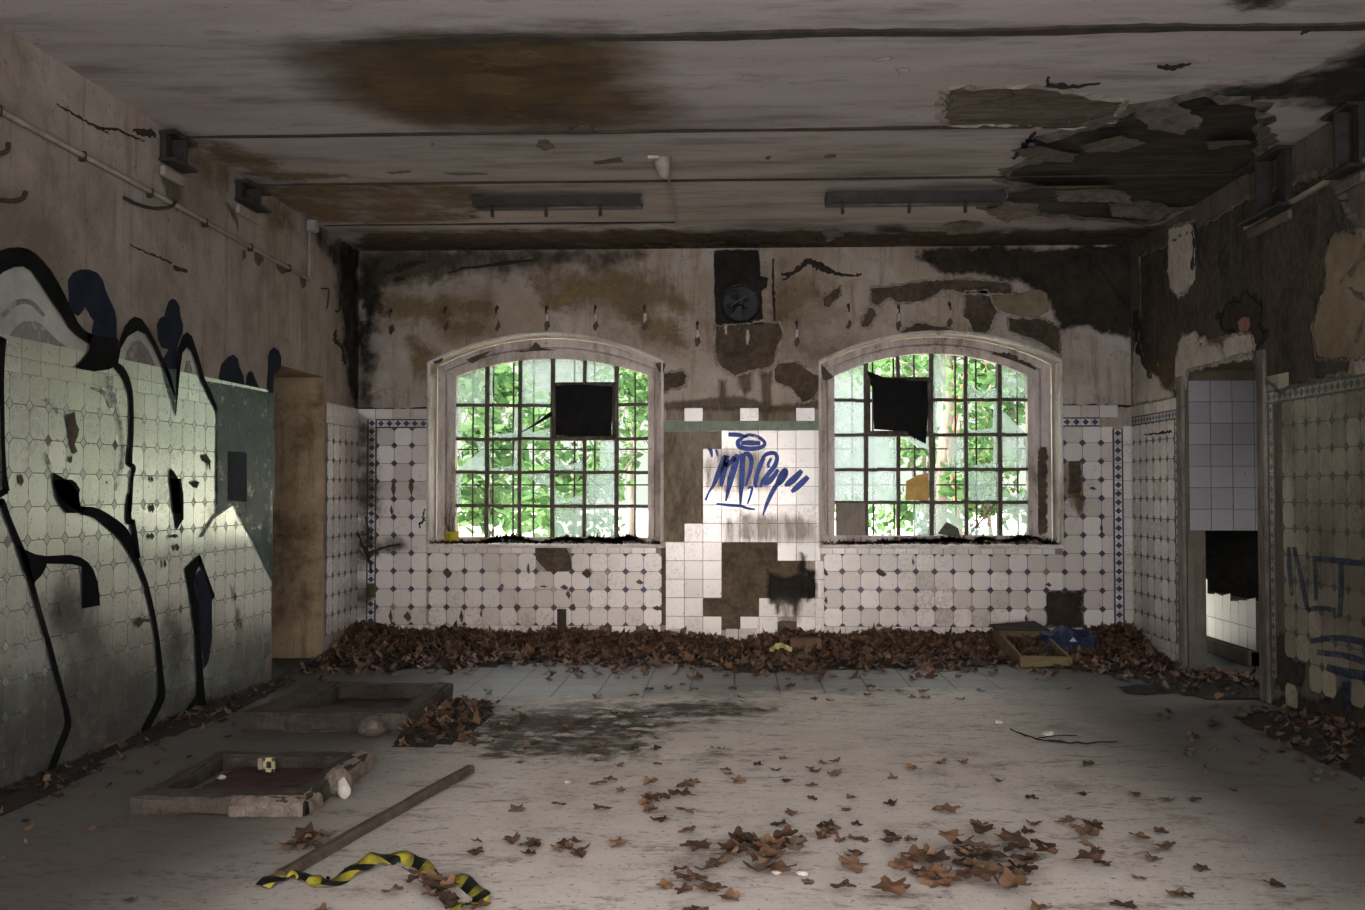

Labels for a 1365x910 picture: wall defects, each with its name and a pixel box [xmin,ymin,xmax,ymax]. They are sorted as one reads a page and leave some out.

leakage [1234,0,1275,9]
leakage [309,41,659,130]
leakage [1205,46,1365,108]
leakage [161,176,180,210]
spalling [934,83,1365,407]
leakage [200,141,1163,559]
peeling [695,319,833,421]
peeling [846,276,1063,359]
spalling [390,480,414,515]
peeling [527,362,740,633]
peeling [1038,447,1049,534]
peeling [703,542,808,631]